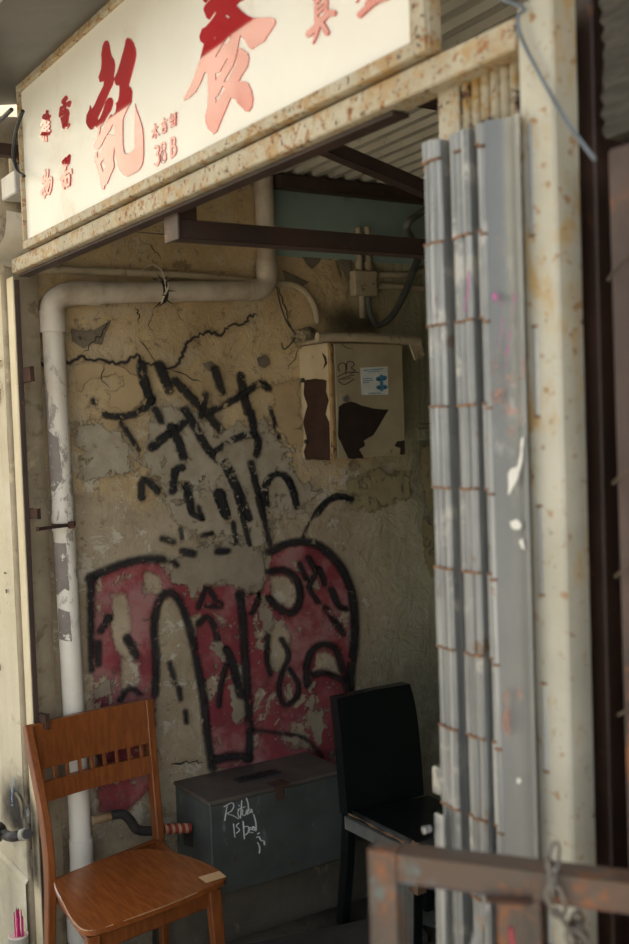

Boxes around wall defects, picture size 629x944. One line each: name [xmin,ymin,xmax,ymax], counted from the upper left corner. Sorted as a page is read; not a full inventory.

crack [41,306,255,388]
crack [279,289,299,370]
peeling [343,444,436,578]